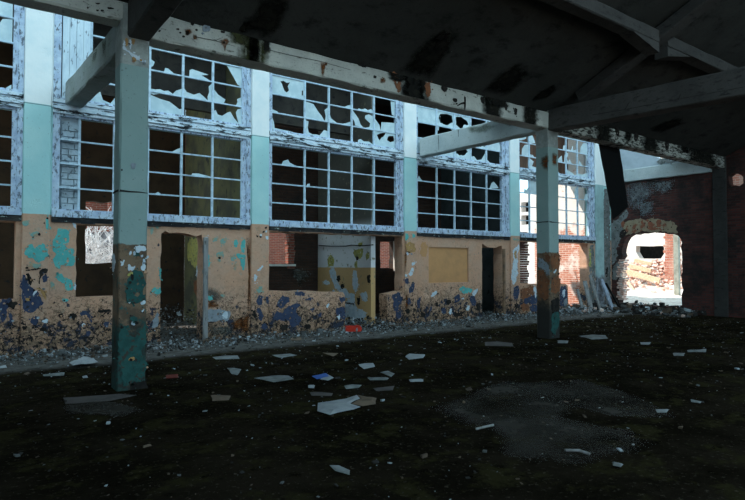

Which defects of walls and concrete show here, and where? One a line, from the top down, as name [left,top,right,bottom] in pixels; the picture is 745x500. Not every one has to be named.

crack [113,187,145,195]
peeling [0,215,76,334]
peeling [59,245,163,390]
peeling [251,242,371,332]
peeling [391,233,482,319]
peeling [511,237,568,337]
peeling [604,189,678,308]